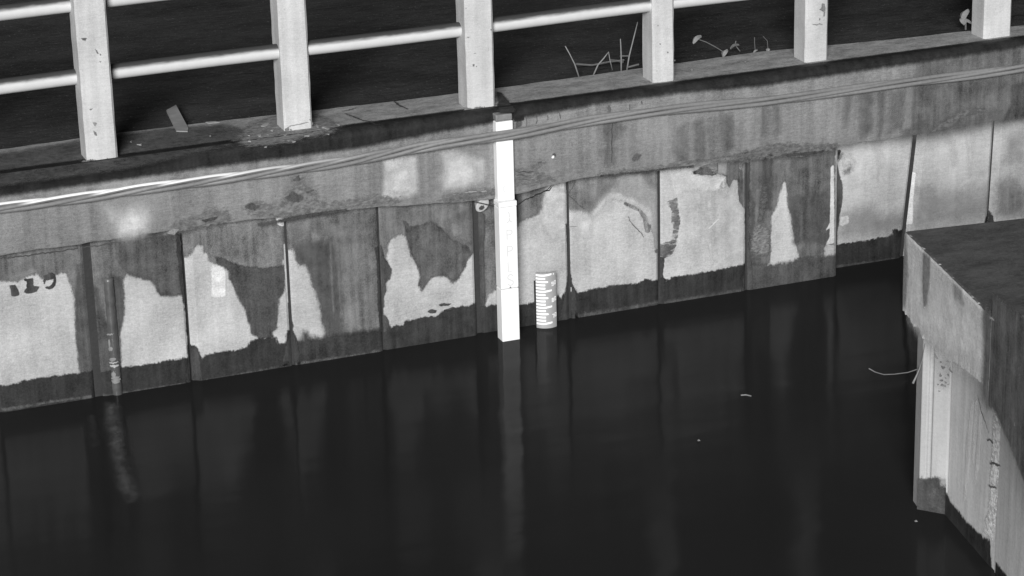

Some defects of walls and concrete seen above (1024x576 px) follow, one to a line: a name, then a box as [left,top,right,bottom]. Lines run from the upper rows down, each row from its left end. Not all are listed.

leakage [0,36,1024,196]
peeling [568,143,838,258]
leakage [668,147,965,304]
leakage [985,182,1024,213]